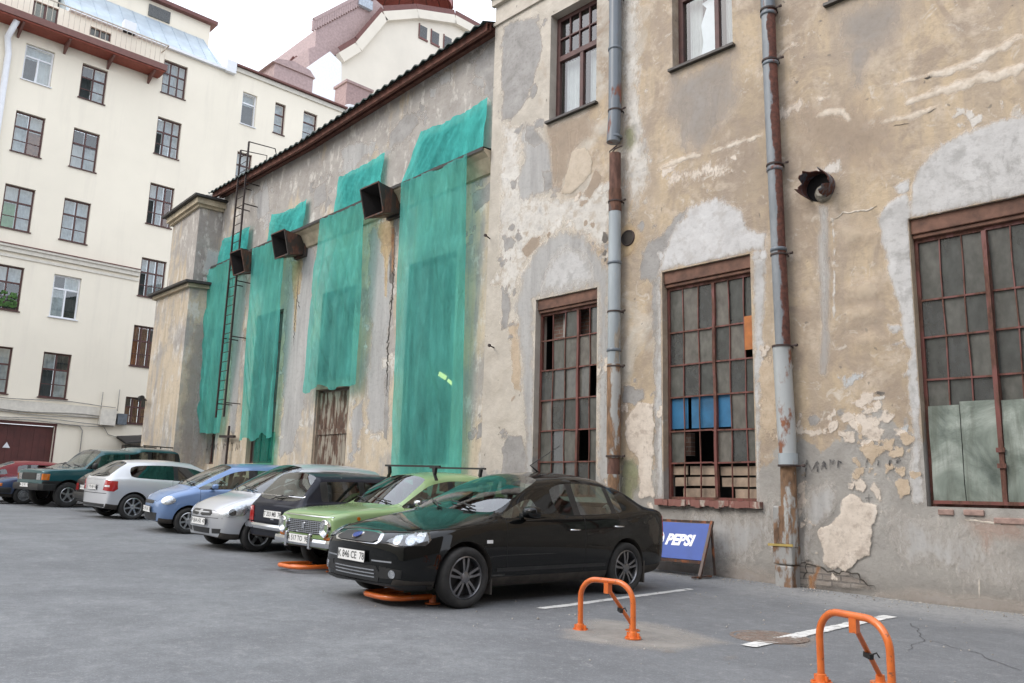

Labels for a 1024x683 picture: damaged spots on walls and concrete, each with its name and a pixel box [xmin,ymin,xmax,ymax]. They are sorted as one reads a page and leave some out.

flaking render [430,14,609,401]
crack [386,246,395,391]
flaking render [621,378,662,509]
spalling [796,391,921,581]
crack [803,562,876,589]